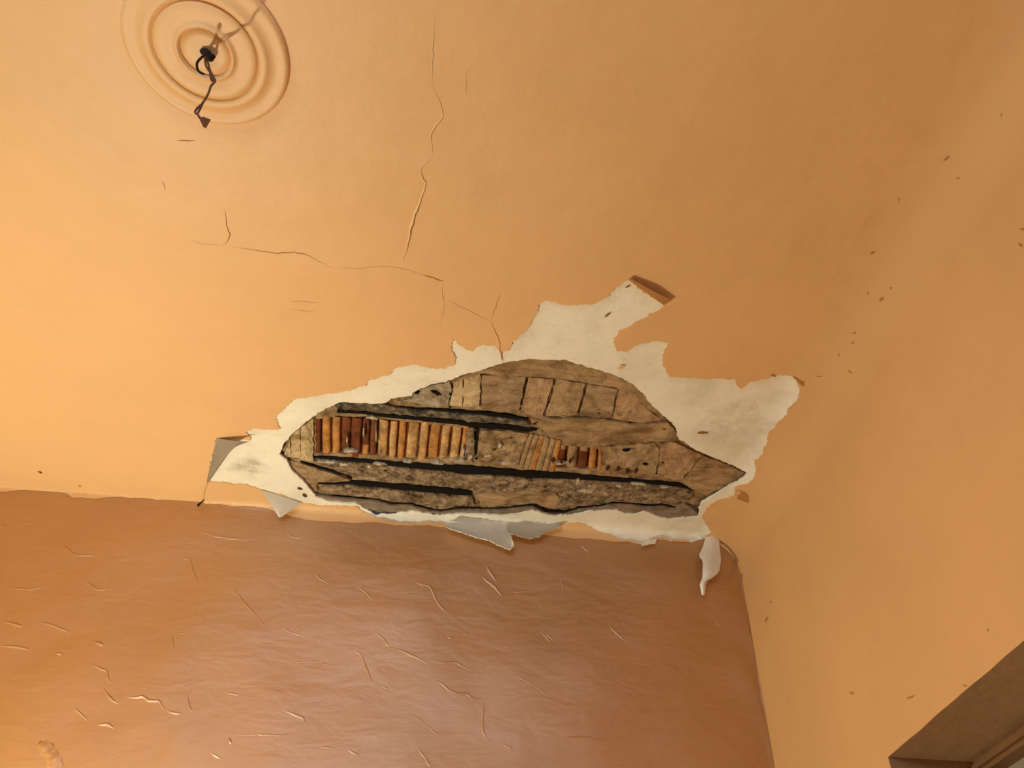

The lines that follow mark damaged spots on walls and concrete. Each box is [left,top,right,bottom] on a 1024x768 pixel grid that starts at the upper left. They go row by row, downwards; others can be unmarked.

crack [193,210,327,266]
crack [354,17,503,362]
spalling [207,278,805,550]